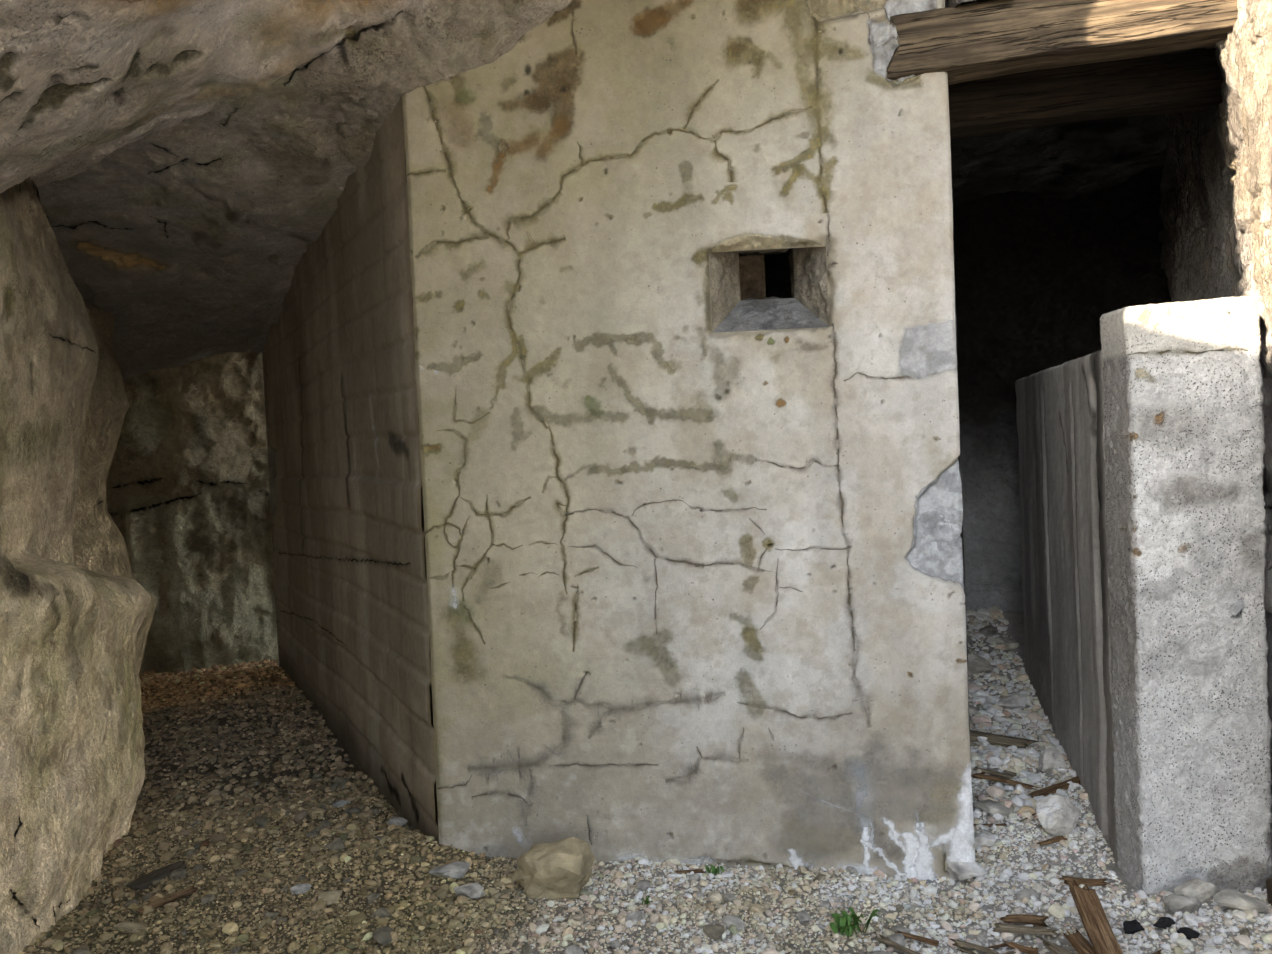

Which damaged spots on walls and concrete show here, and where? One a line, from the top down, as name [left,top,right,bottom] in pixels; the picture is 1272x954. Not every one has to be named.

spalling [807,0,937,88]
crack [279,8,945,816]
peeling [900,321,957,378]
crack [1128,347,1249,355]
spalling [907,460,965,592]
water stain [767,742,976,881]